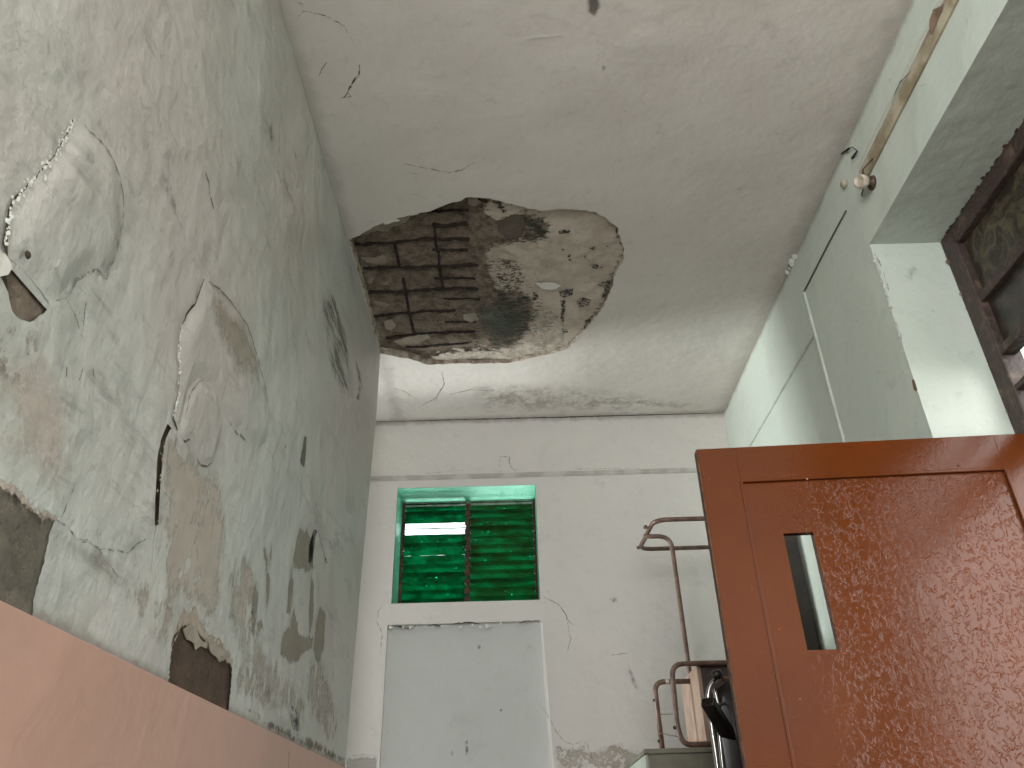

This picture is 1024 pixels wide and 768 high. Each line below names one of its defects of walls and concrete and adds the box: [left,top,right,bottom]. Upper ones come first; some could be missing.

flaking render [0,252,47,322]
spalling [350,197,624,365]
crack [382,373,728,422]
peeling [0,479,57,616]
crack [64,418,178,582]
peeling [139,529,336,737]
leakage [268,706,343,761]